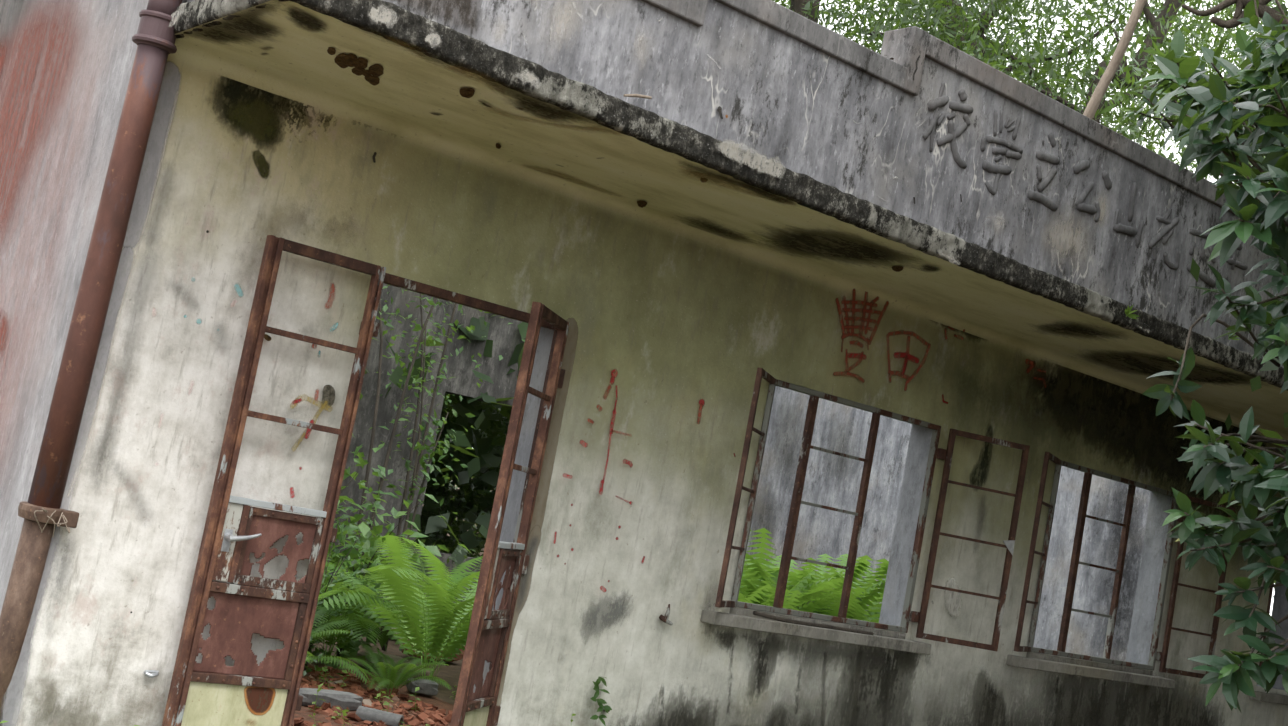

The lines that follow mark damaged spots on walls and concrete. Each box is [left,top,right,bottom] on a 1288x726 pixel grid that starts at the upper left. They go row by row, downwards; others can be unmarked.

water stain [213,76,331,178]
water stain [689,219,745,240]
water stain [769,231,939,272]
water stain [585,597,626,632]
water stain [753,643,776,691]
water stain [655,691,710,726]
water stain [758,652,1218,726]